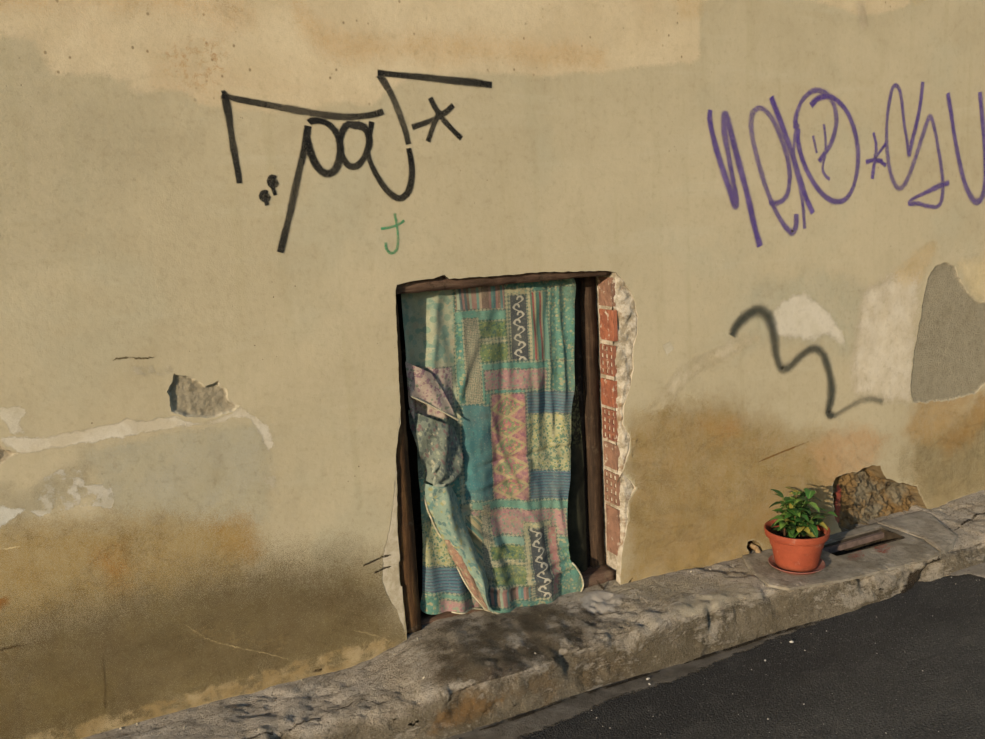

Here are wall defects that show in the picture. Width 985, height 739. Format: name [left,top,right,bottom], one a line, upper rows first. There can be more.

spalling [767,262,985,411]
peeling [0,469,115,527]
peeling [0,374,274,466]
spalling [595,272,762,582]
leakage [622,386,985,582]
spalling [832,465,927,532]
leakage [0,498,407,739]
spalling [25,633,399,739]